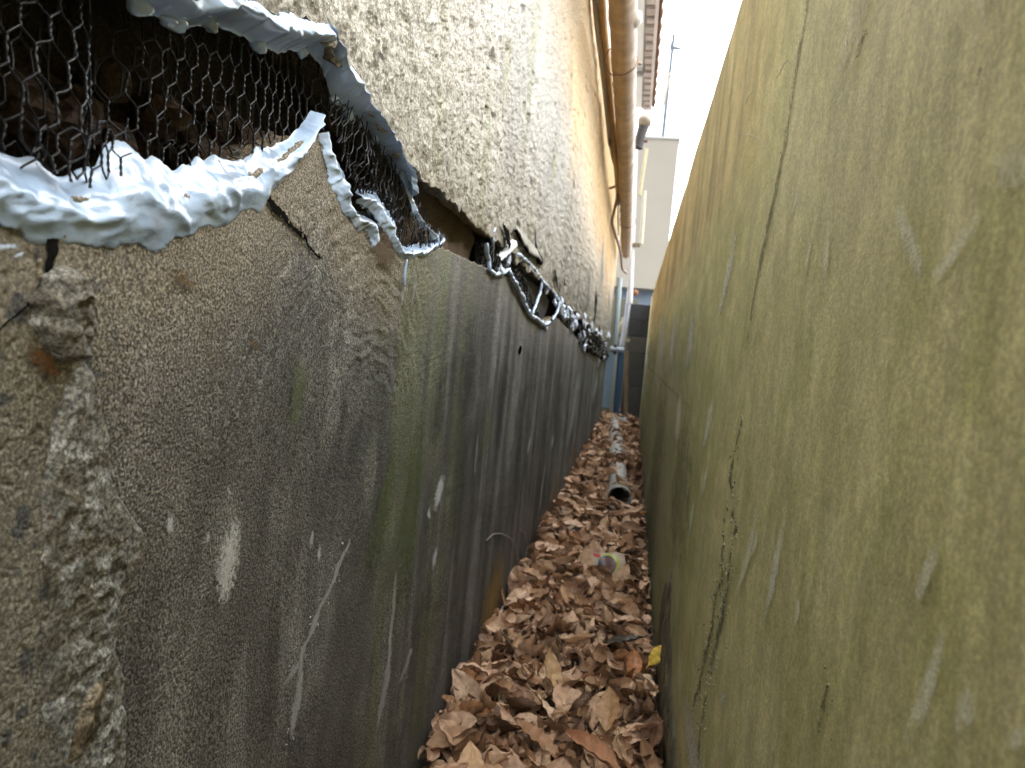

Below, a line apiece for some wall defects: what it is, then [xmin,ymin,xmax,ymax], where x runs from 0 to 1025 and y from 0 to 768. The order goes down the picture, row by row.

spalling [0,0,445,287]
crack [267,195,322,258]
spalling [475,226,610,367]
crack [746,1,809,339]
crack [691,407,743,768]
crack [816,665,833,740]